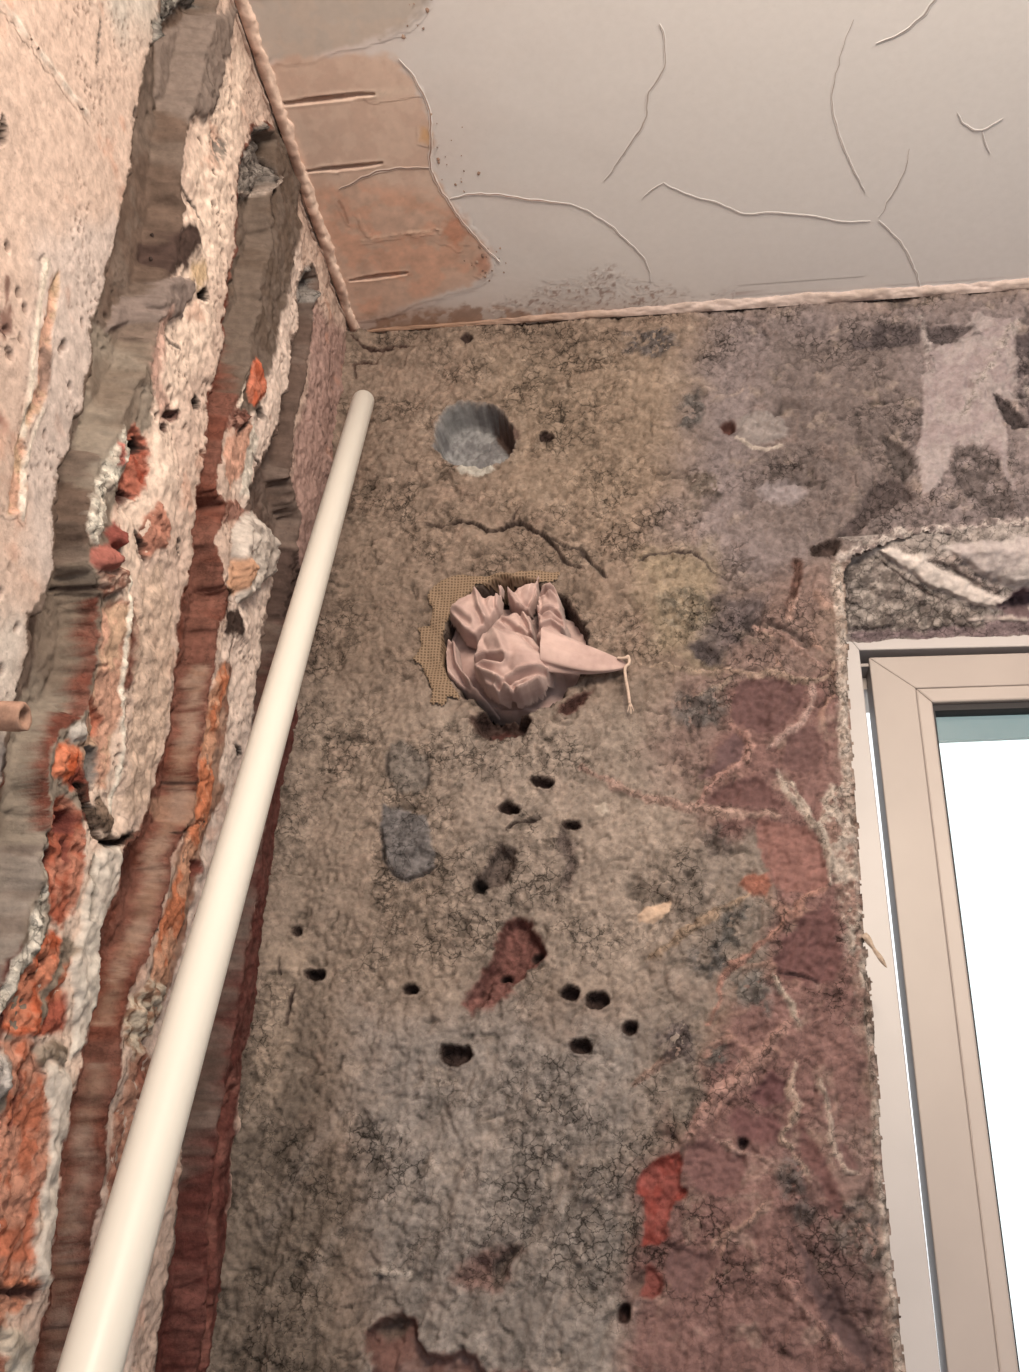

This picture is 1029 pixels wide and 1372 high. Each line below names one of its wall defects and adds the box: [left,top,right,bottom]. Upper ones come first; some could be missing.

crack [338,59,651,282]
crack [603,24,667,181]
crack [643,0,937,287]
crack [957,113,1003,154]
flaking render [221,354,268,500]
spalling [990,331,1029,432]
spalling [266,545,302,624]
crack [423,501,759,583]
crack [757,615,816,647]
flaking render [0,252,211,1324]
flaking render [104,657,243,1209]
spalling [696,431,1029,1372]